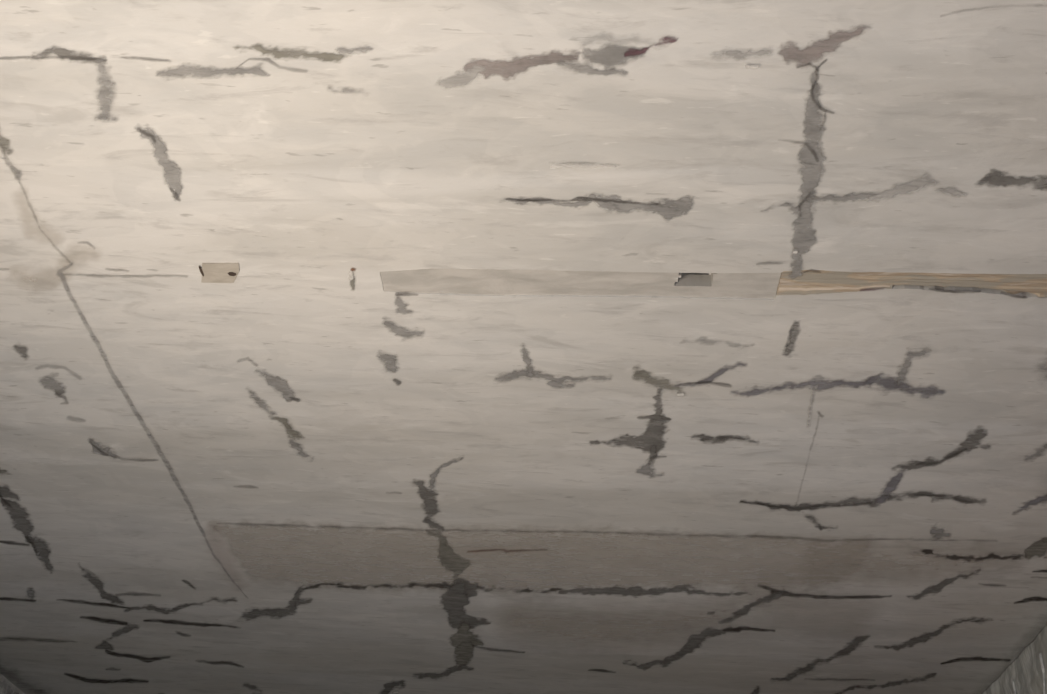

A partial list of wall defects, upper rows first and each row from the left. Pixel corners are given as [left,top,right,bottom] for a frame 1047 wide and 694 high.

crack [38,47,115,120]
crack [138,128,182,200]
crack [723,27,1047,278]
crack [509,194,693,220]
crack [249,373,308,457]
crack [496,349,606,388]
crack [633,351,944,410]
crack [744,429,990,530]
crack [0,470,53,601]
crack [64,458,542,683]
crack [521,538,1047,681]
crack [836,657,1010,694]